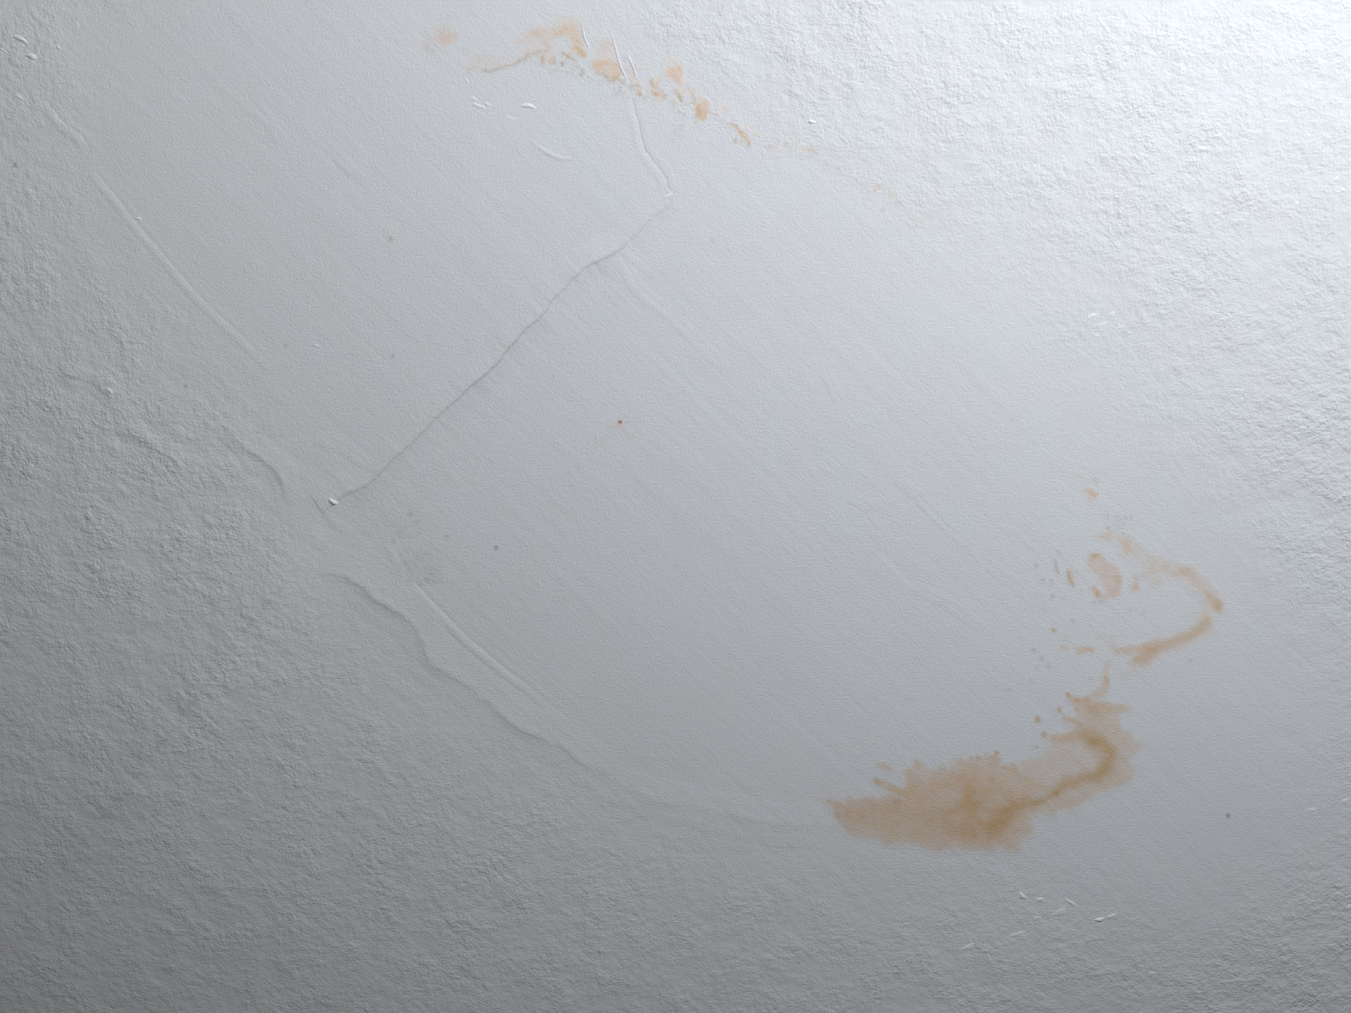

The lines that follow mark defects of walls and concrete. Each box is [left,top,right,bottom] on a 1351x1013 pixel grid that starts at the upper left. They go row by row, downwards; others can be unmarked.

water stain [423,11,932,228]
water stain [823,465,1227,857]